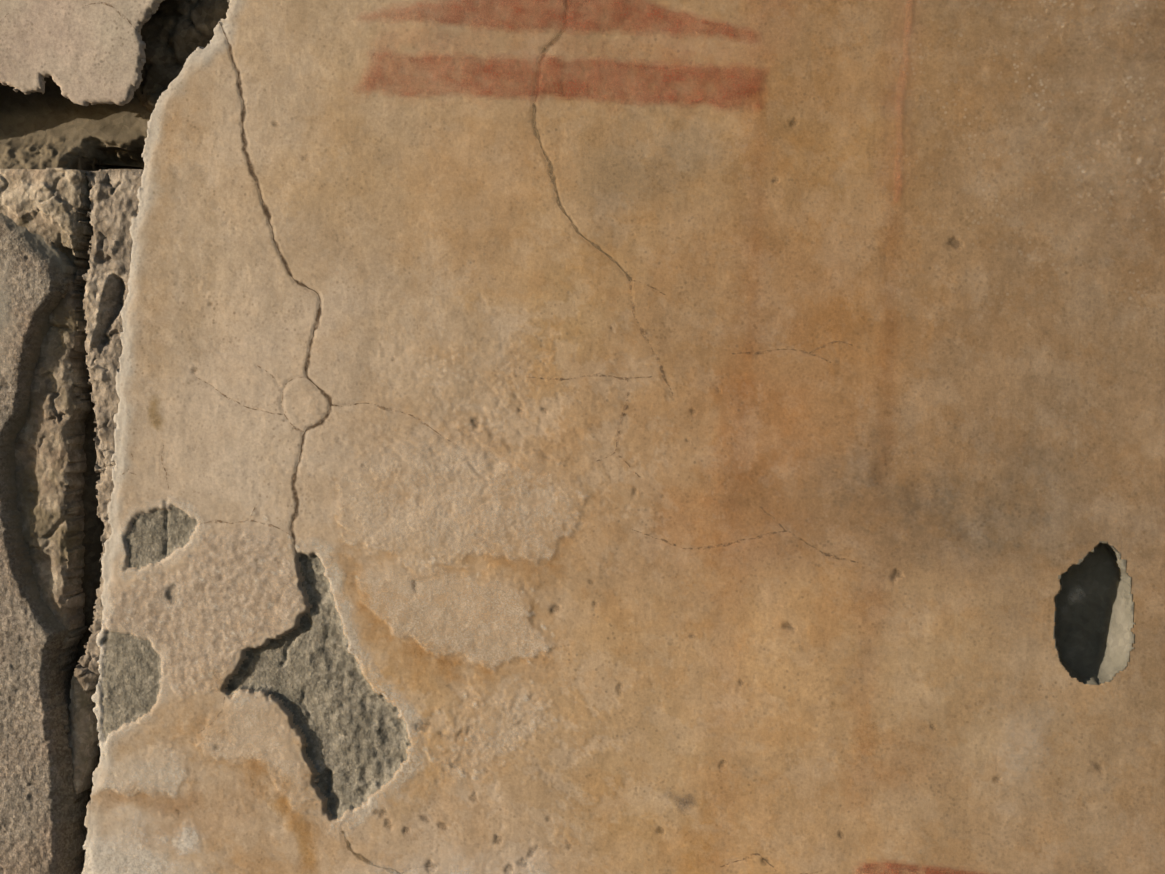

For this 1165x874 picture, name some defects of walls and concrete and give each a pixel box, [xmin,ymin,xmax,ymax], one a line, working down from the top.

crack [78,147,144,171]
crack [198,22,449,554]
crack [532,0,673,477]
crack [74,366,133,671]
spalling [126,506,198,570]
spalling [101,631,161,741]
spalling [225,543,428,828]
crack [83,747,101,862]
crack [341,831,429,874]